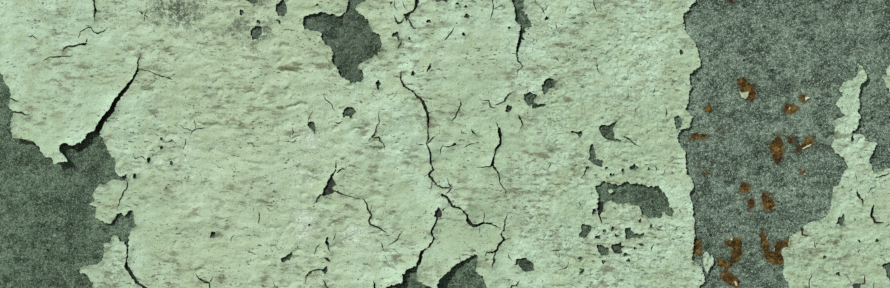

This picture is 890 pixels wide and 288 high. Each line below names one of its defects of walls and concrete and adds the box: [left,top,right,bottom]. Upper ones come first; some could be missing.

peeling [303,0,382,83]
crack [95,57,173,133]
peeling [0,20,140,288]
crack [117,153,213,288]
crack [313,163,402,259]
peeling [369,232,534,288]
crack [393,31,584,286]
rust [717,238,742,288]
rust [739,182,774,211]
rust [759,232,791,264]
peeling [674,0,890,288]
rust [770,135,813,164]